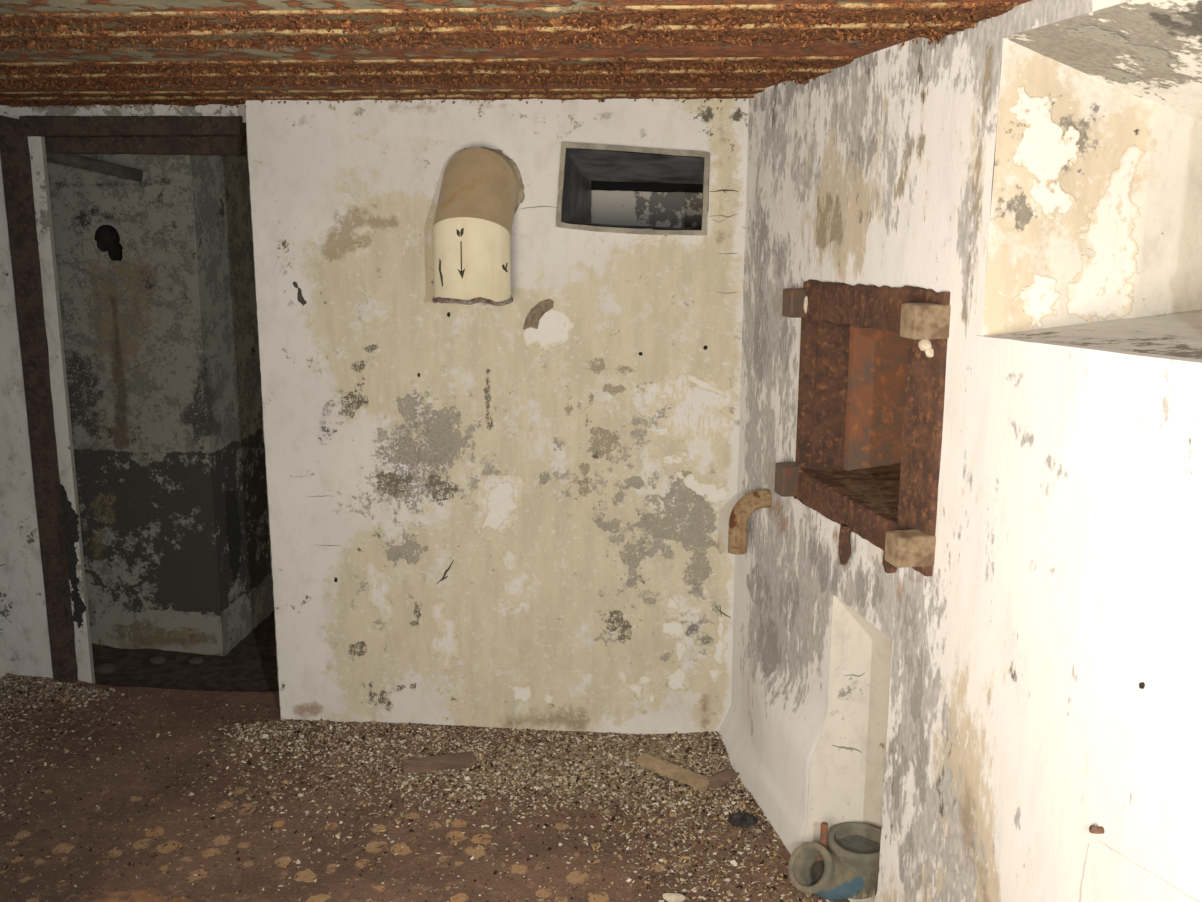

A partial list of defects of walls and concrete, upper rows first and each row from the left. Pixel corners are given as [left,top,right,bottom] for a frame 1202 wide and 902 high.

peeling [1065,19,1188,82]
water stain [972,46,992,227]
water stain [522,308,575,351]
water stain [918,339,934,357]
water stain [324,391,369,418]
peeling [565,358,632,496]
water stain [642,362,733,505]
peeling [386,541,428,564]
water stain [372,394,534,609]
peeling [594,471,717,590]
water stain [605,610,632,643]
water stain [617,593,728,703]